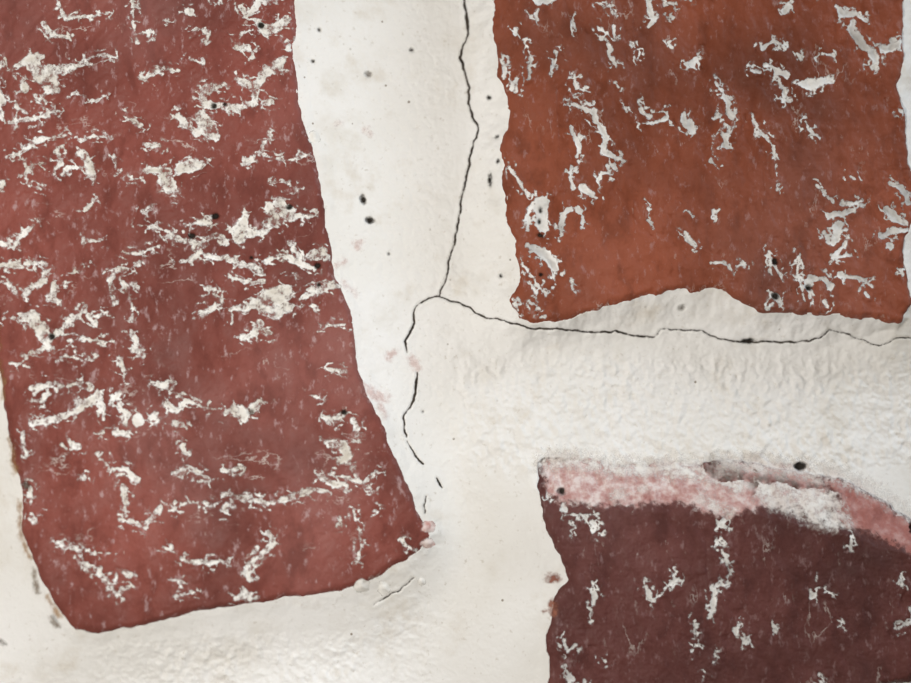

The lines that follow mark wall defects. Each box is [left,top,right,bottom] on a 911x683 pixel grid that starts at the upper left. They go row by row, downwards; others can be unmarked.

crack [404,0,909,350]
crack [402,372,442,513]